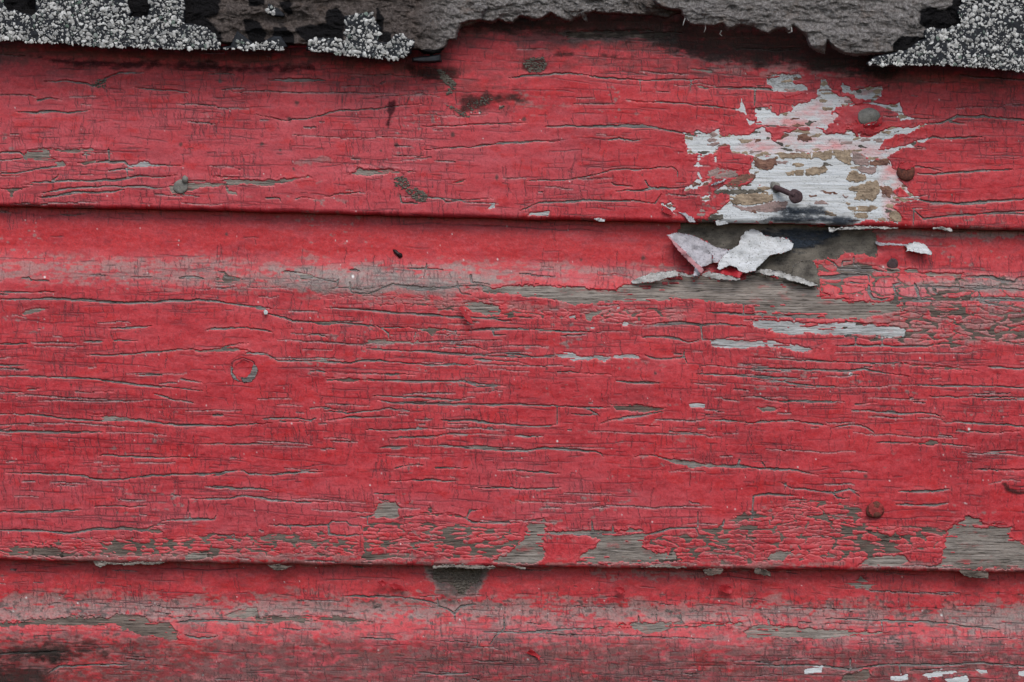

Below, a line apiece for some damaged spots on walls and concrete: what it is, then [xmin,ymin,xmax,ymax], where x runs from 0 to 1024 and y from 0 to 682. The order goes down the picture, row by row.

crack [18,72,188,114]
crack [257,72,793,150]
crack [927,114,1024,140]
crack [0,149,173,198]
crack [524,166,679,210]
peeling [311,68,1024,356]
crack [913,166,1024,224]
crack [0,257,1024,540]
peeling [0,497,1024,596]
crack [177,619,273,640]
crack [826,618,999,631]
crack [736,659,1024,676]